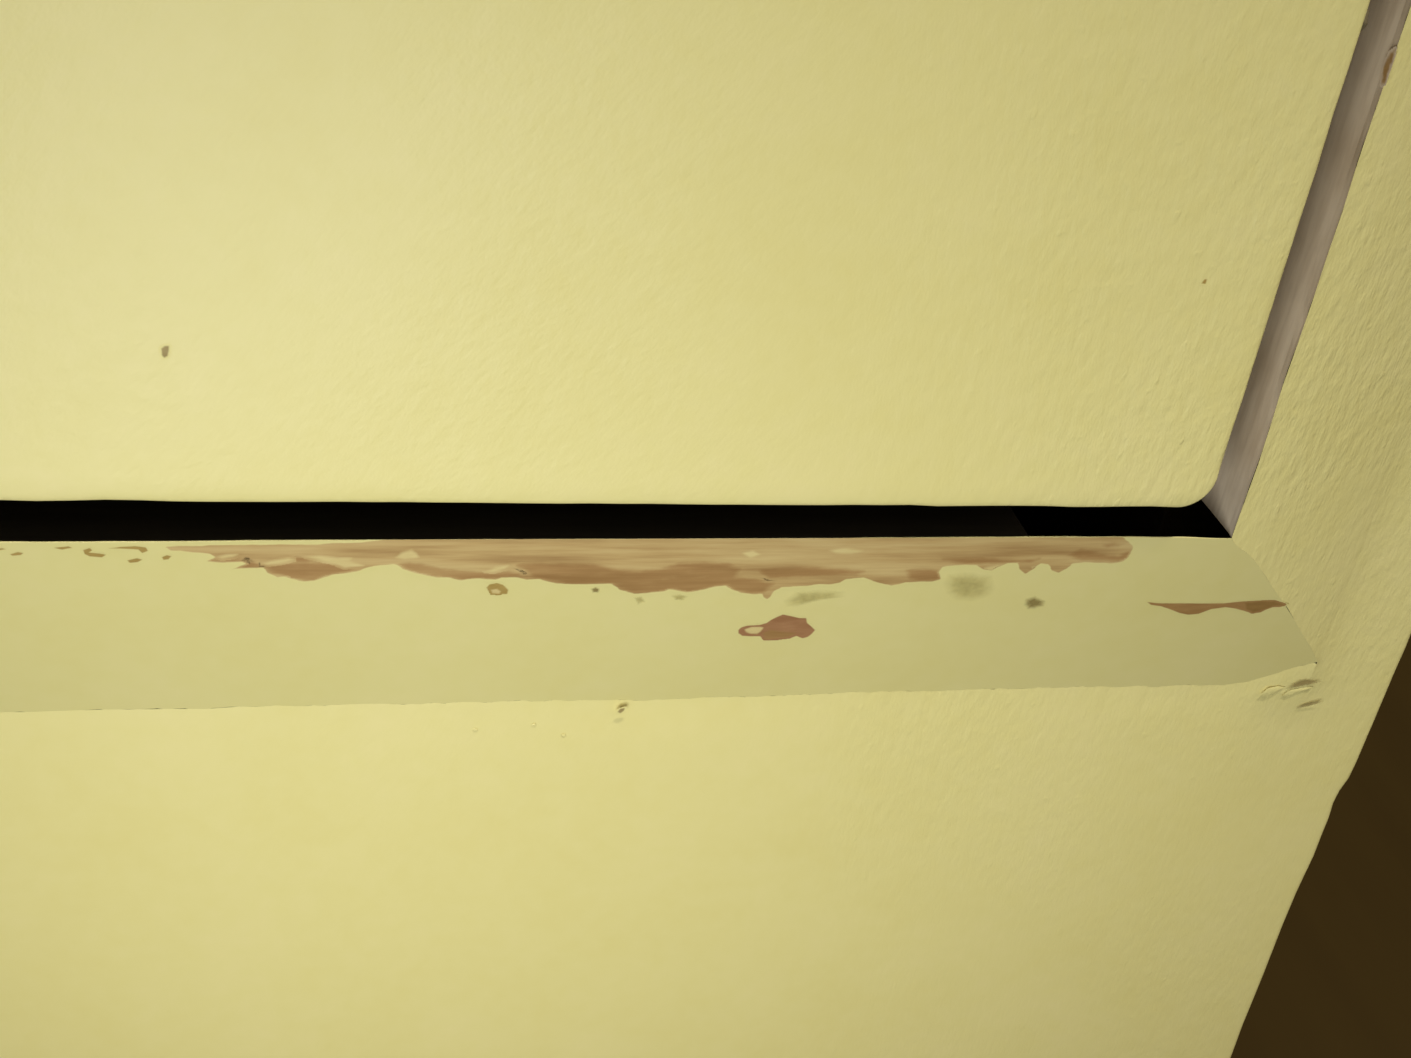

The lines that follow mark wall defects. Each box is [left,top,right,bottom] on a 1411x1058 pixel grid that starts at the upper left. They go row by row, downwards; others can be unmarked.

peeling [162,537,1137,641]
peeling [1145,599,1289,616]